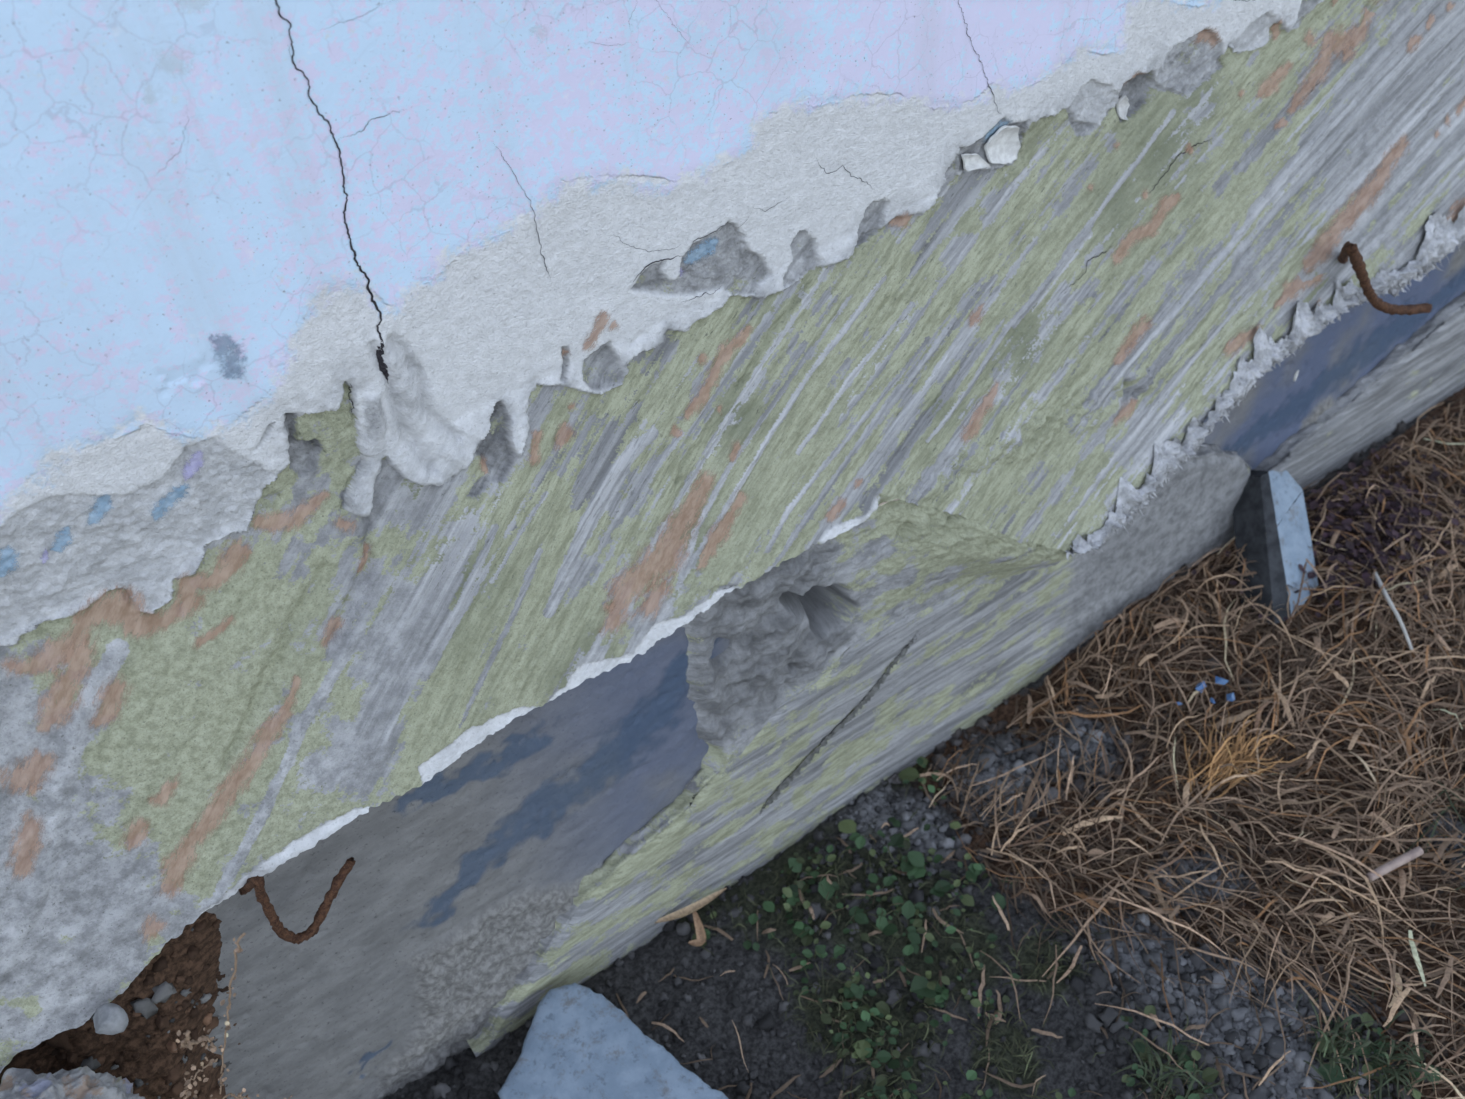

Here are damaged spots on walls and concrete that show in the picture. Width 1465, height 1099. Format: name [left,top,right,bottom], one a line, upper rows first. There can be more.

crack [958,1,999,113]
flaking render [1065,0,1323,139]
crack [275,0,408,419]
flaking render [628,221,823,298]
flaking render [955,117,1031,174]
rust [1274,135,1408,309]
spalling [1338,241,1432,315]
water stain [209,335,246,378]
flaking render [466,401,516,501]
water stain [1065,206,1465,559]
flaking render [0,413,325,640]
spalling [416,496,881,785]